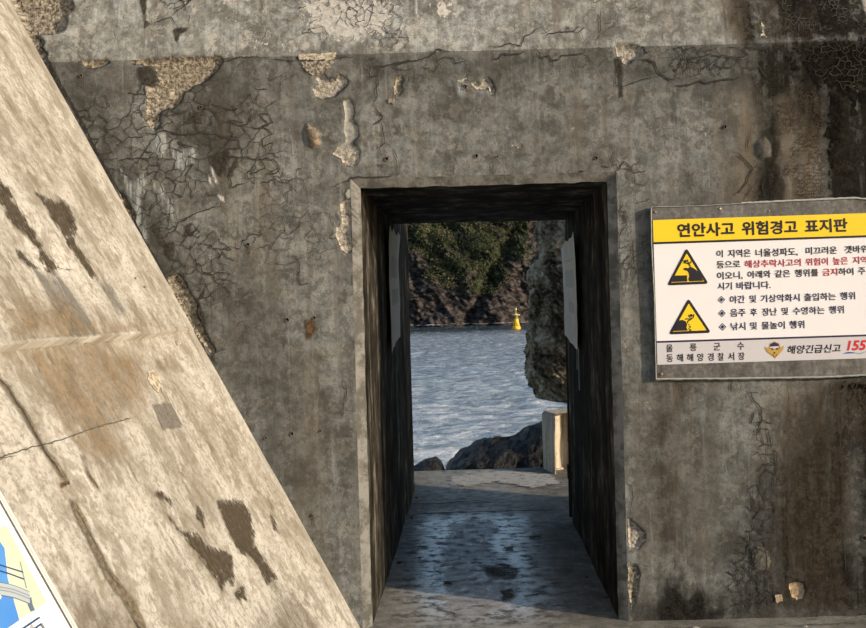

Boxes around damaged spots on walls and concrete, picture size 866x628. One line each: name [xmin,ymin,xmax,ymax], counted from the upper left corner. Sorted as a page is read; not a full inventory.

spalling [11,0,74,60]
flaking render [131,55,222,131]
crack [72,0,468,324]
flaking render [298,52,360,167]
crack [490,0,768,95]
crack [735,0,866,199]
leakage [778,0,866,189]
leakage [0,179,98,337]
leakage [35,192,125,311]
leakage [156,491,278,602]
crack [727,381,792,614]
flaking render [775,582,805,603]